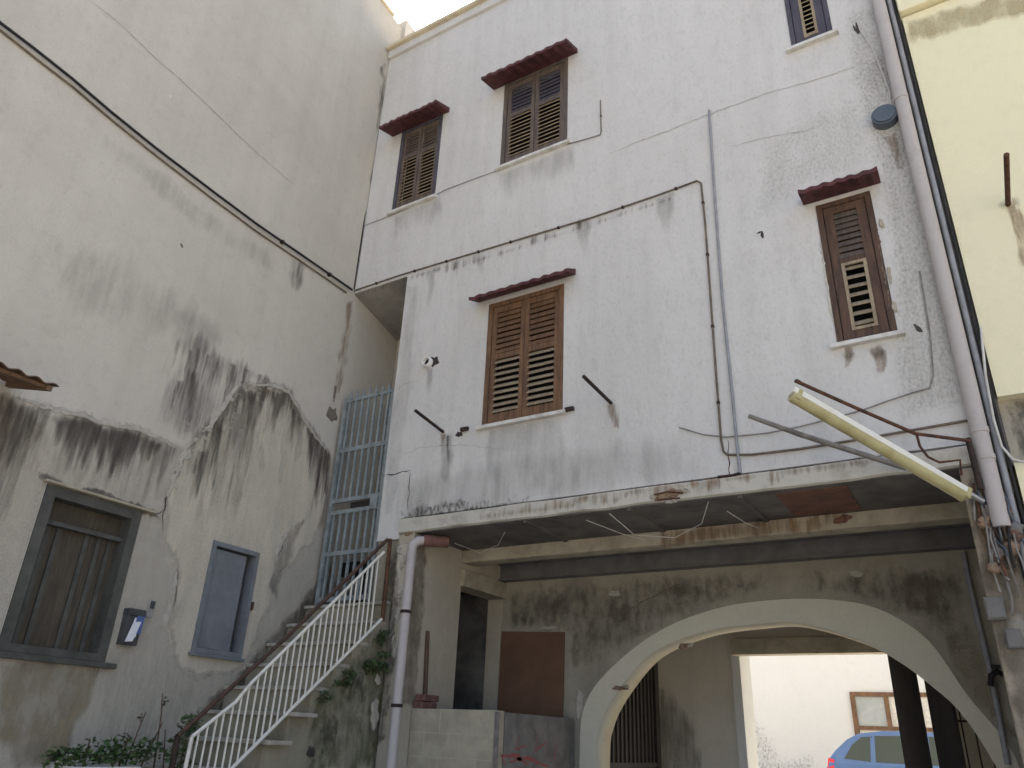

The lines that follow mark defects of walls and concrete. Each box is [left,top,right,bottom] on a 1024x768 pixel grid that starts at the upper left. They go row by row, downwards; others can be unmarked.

damp [58,418,160,472]
damp [197,365,329,493]
spalling [650,487,690,504]